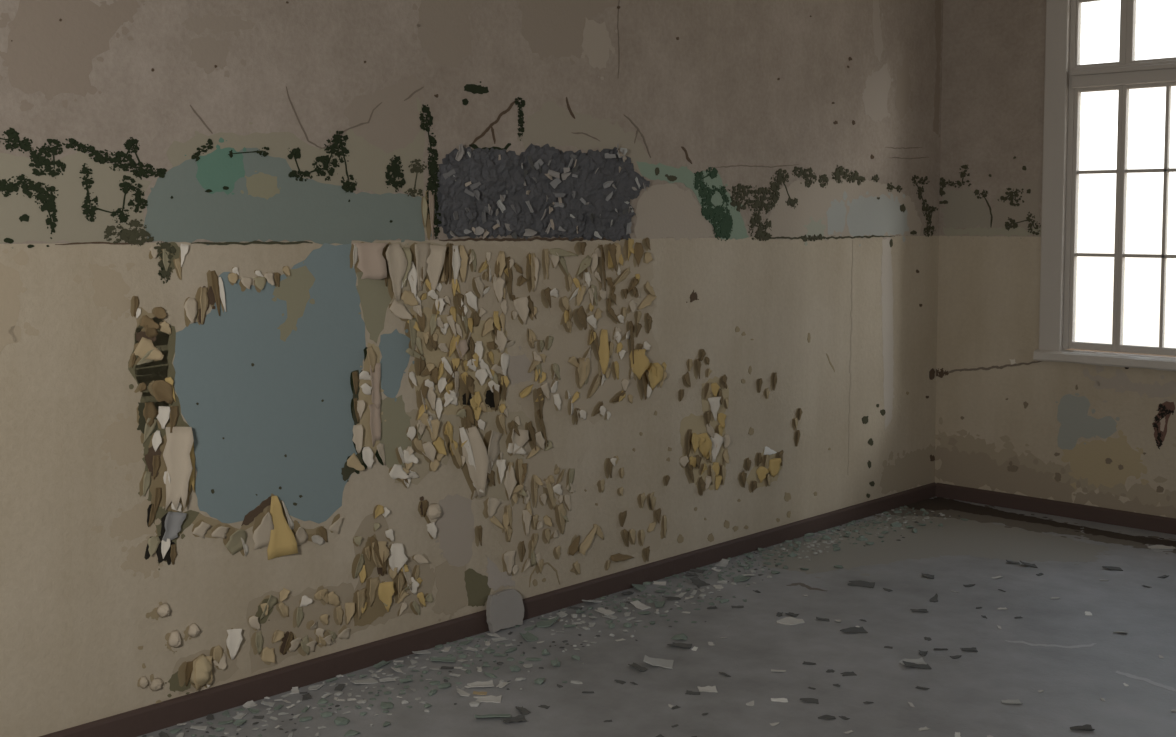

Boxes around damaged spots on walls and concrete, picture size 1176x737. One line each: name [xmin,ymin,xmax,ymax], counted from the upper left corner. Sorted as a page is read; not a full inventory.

leakage [191,139,213,161]
leakage [228,147,269,158]
leakage [288,74,427,202]
mould [693,167,733,241]
peeling [0,97,922,586]
peeling [172,505,468,695]
peeling [776,612,868,633]
peeling [628,655,674,672]